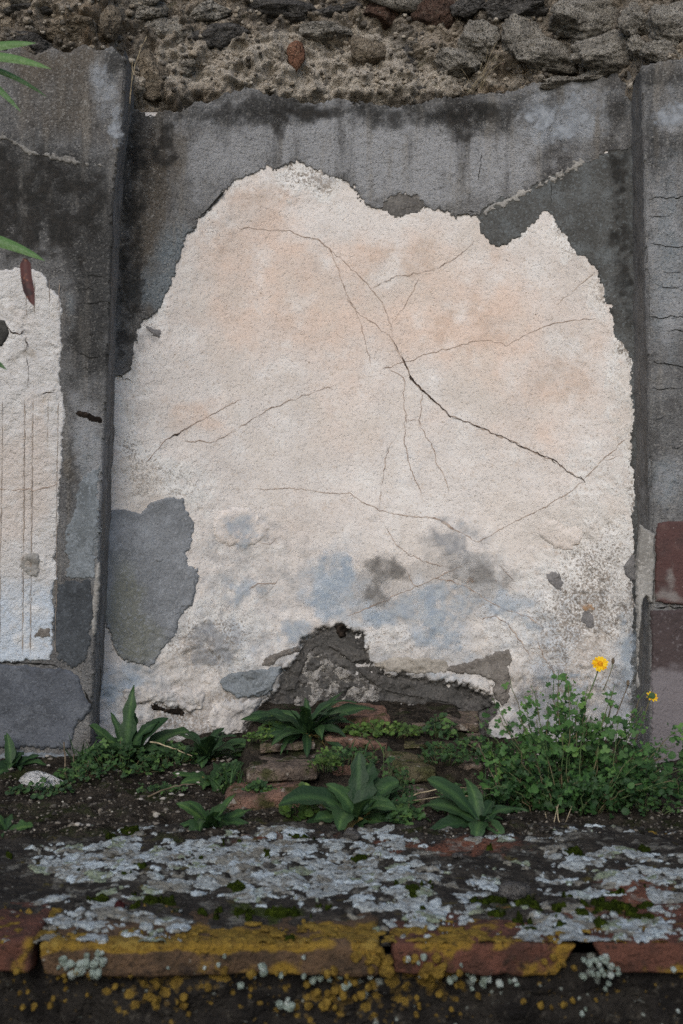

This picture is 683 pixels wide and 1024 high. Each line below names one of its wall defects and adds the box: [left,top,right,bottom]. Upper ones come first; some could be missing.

leakage [109,113,177,177]
leakage [270,106,327,132]
leakage [443,102,497,141]
efflorescence [525,93,588,138]
leakage [0,148,105,257]
flaking render [381,194,424,218]
spalling [483,158,584,216]
crack [146,386,328,462]
crack [239,227,627,674]
flaking render [91,497,199,667]
flaking render [120,623,512,737]